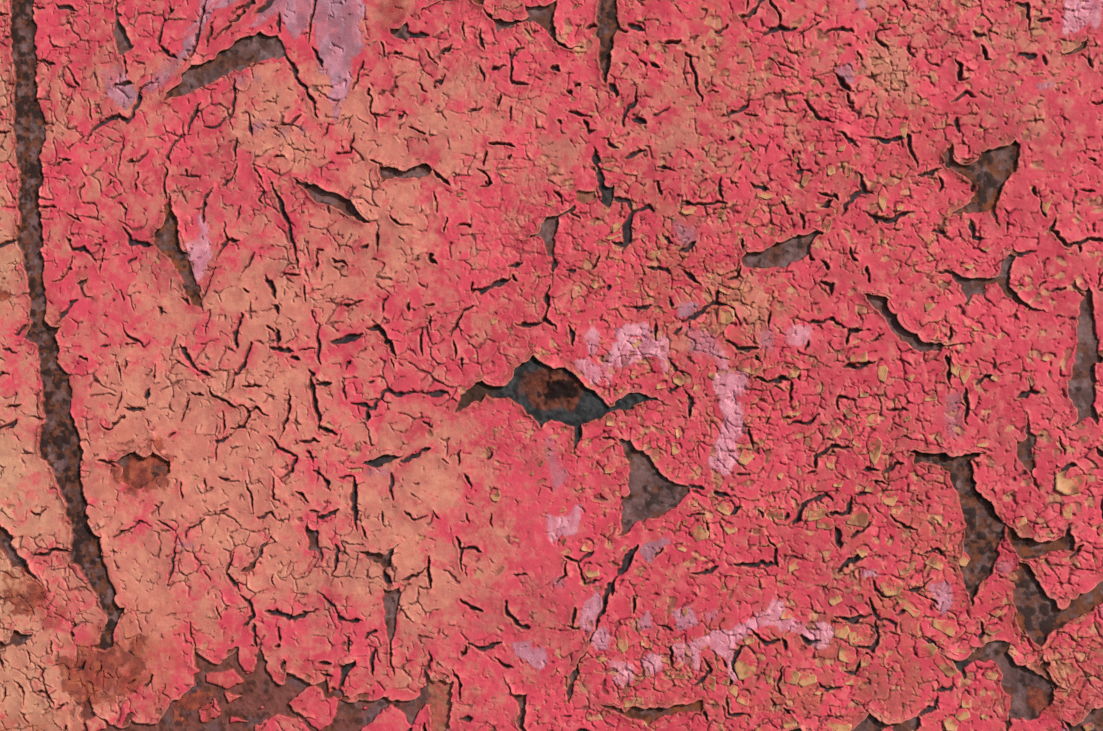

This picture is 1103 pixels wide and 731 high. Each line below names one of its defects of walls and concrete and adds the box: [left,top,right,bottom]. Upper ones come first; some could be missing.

peeling [160,27,287,100]
crack [519,0,914,369]
crack [631,237,854,448]
peeling [1063,277,1103,428]
corrosion [113,437,173,492]
peeling [606,412,698,536]
crack [557,544,662,629]
crack [688,444,937,691]
peeling [875,440,1103,731]
corrosion [55,636,151,707]
peeling [81,647,454,731]
crack [695,629,819,722]